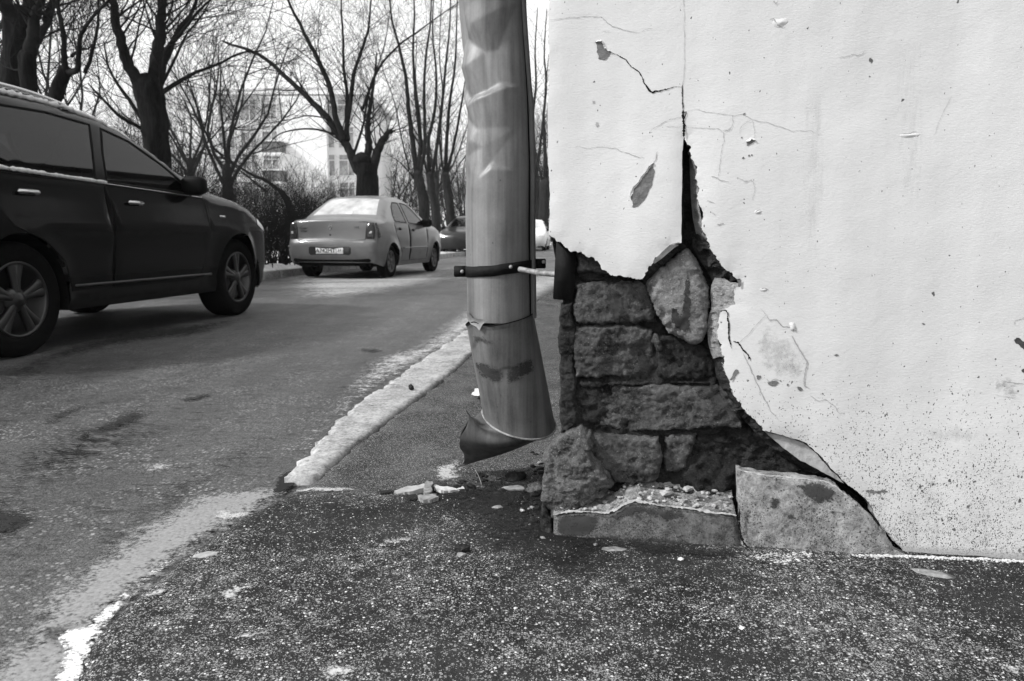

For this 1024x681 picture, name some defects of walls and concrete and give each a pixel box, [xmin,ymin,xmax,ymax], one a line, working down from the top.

spalling [595,40,611,60]
crack [550,0,819,225]
spalling [540,143,876,533]
crack [721,309,773,414]